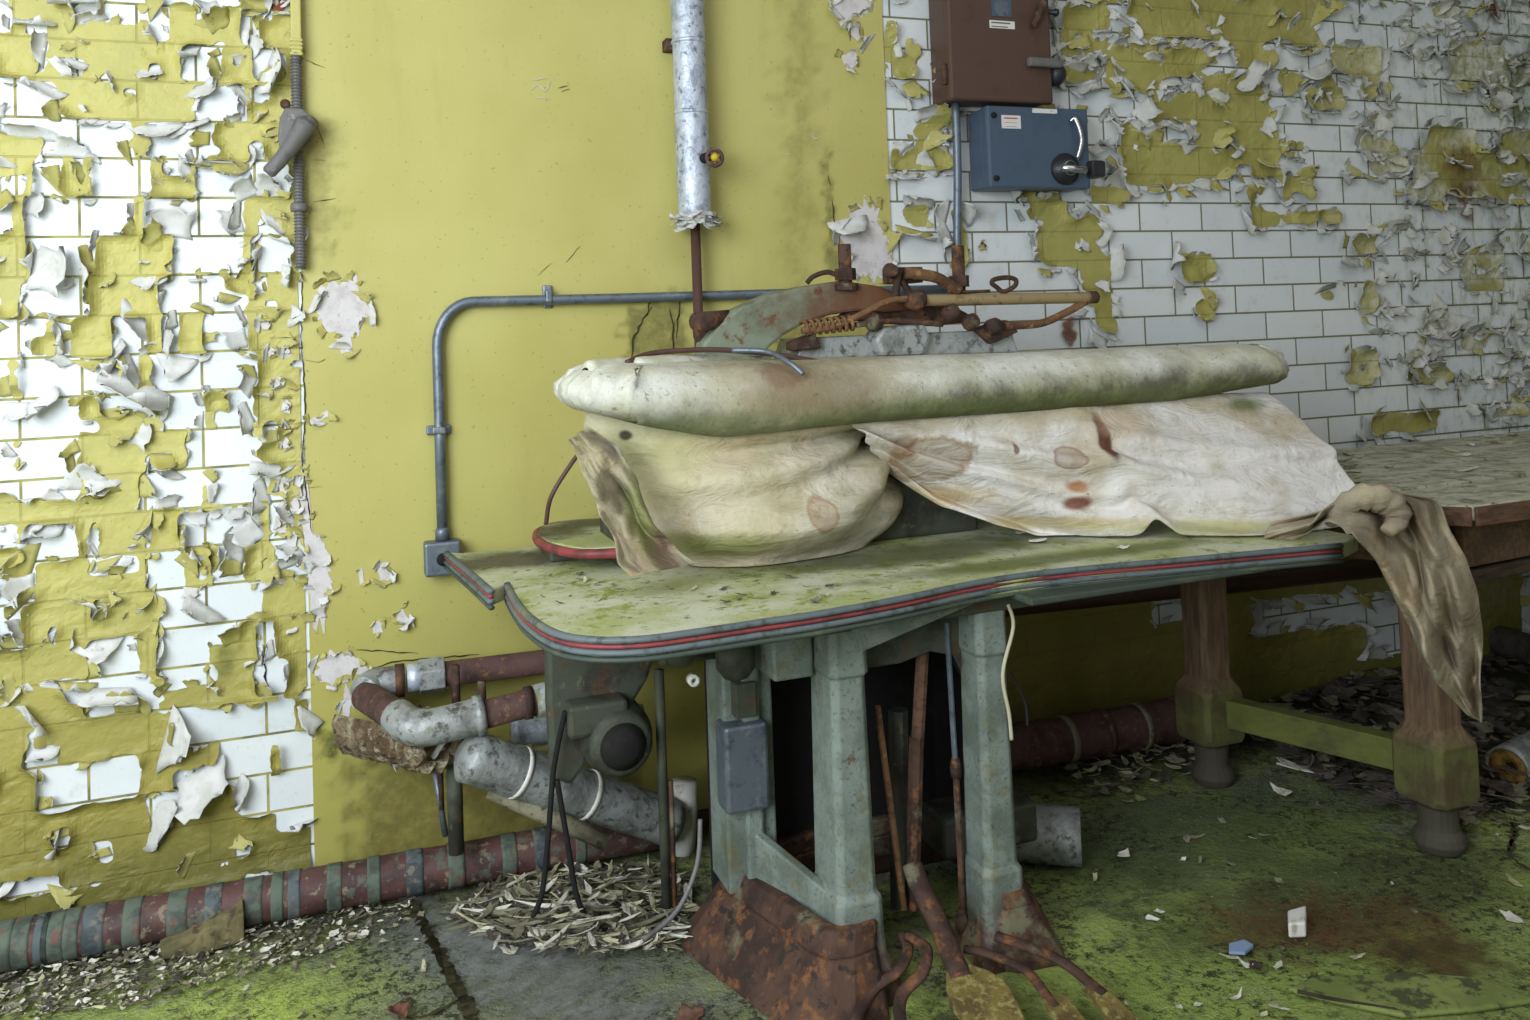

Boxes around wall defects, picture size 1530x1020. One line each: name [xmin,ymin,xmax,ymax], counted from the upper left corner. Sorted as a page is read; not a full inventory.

peeling [827,0,987,284]
peeling [1011,0,1530,445]
peeling [0,0,376,920]
spalling [355,560,397,588]
spalling [369,601,415,639]
peeling [1005,599,1185,725]
peeling [1227,577,1402,702]
peeling [1475,574,1530,660]